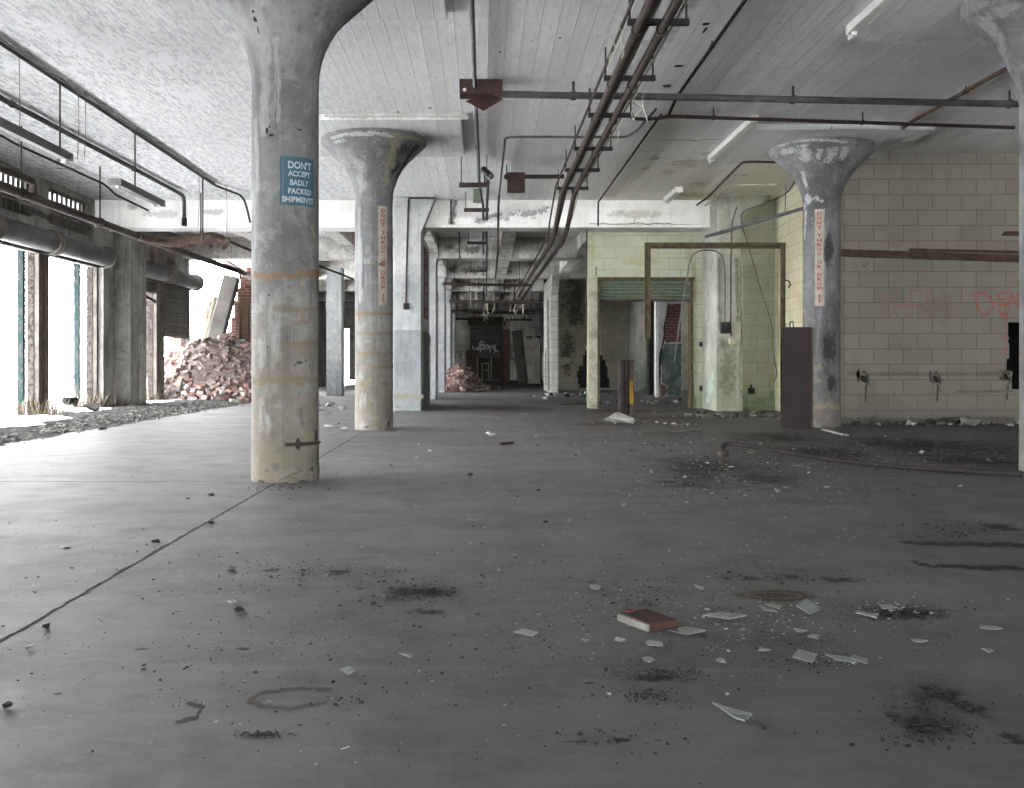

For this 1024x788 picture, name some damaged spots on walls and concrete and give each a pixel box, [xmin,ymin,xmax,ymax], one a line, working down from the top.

peeling [329,131,421,304]
peeling [393,258,420,327]
peeling [661,304,682,396]
water stain [717,257,741,351]
peeling [771,138,851,239]
water stain [823,228,835,273]
peeling [357,387,369,430]